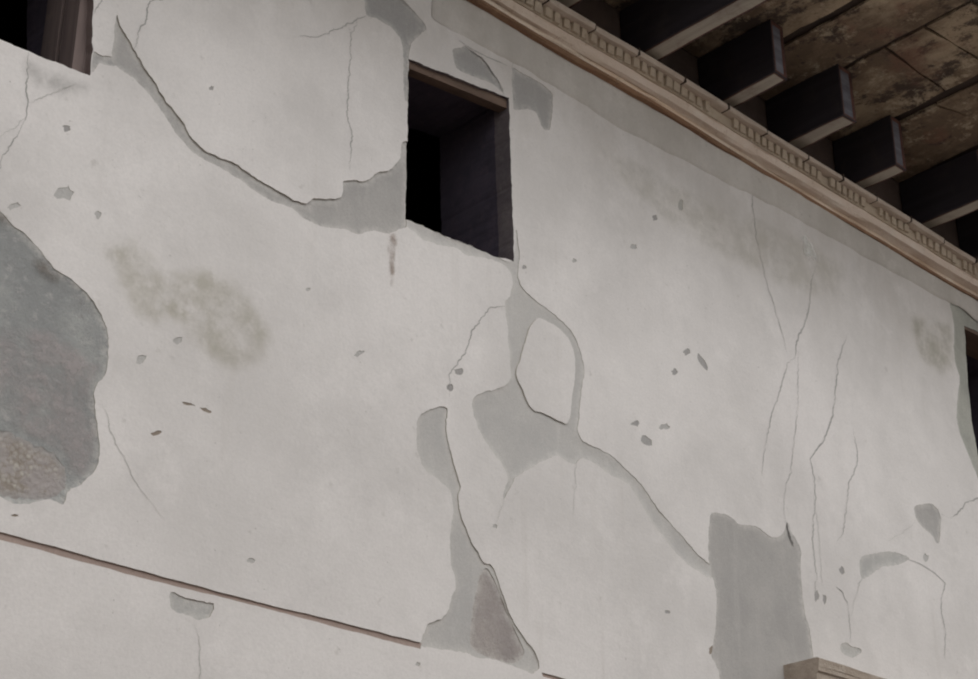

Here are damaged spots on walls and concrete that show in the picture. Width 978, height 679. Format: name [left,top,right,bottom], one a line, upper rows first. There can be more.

crack [0,52,75,168]
flaking render [54,187,74,200]
crack [303,16,365,162]
spalling [0,202,109,504]
peeling [91,0,813,679]
crack [752,195,863,635]
peeling [950,303,978,478]
crack [907,559,946,656]